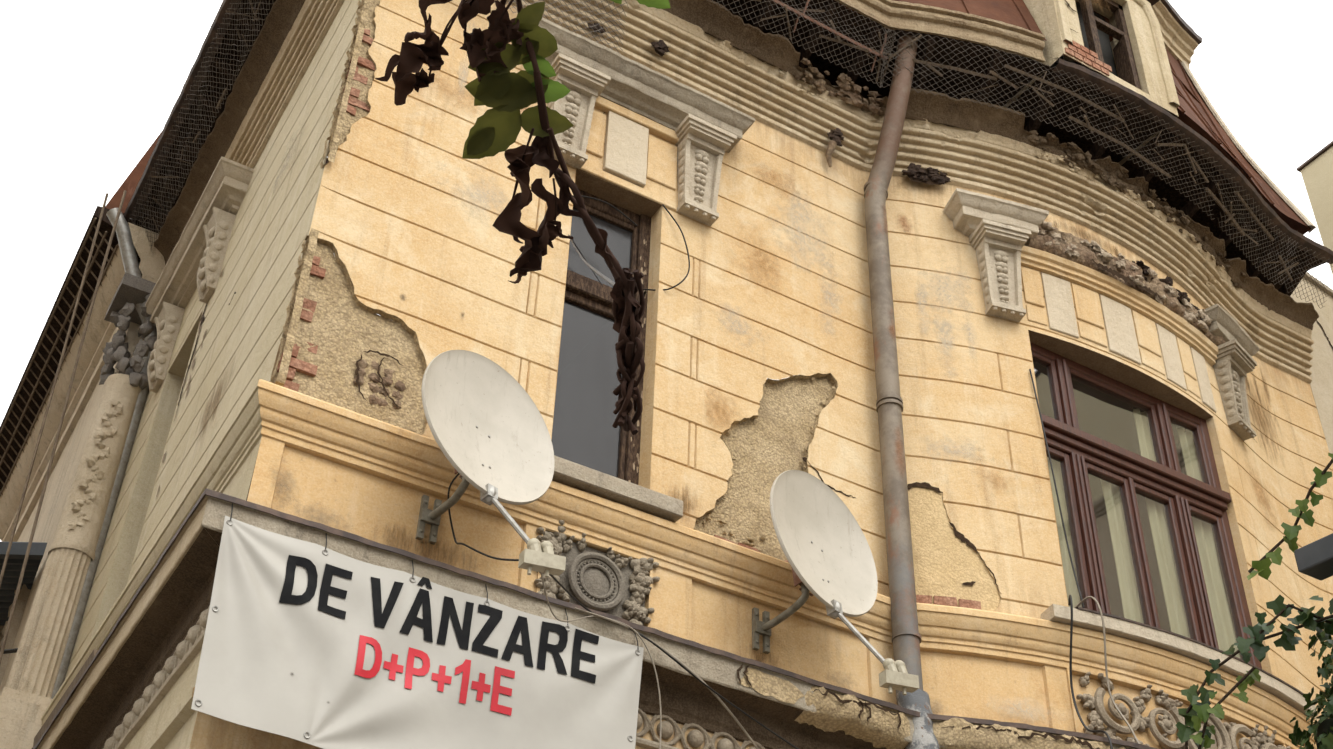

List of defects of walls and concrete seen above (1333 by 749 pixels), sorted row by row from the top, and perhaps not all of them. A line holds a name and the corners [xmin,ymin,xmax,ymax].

flaking render [270,228,427,435]
flaking render [1028,226,1225,346]
flaking render [694,373,838,563]